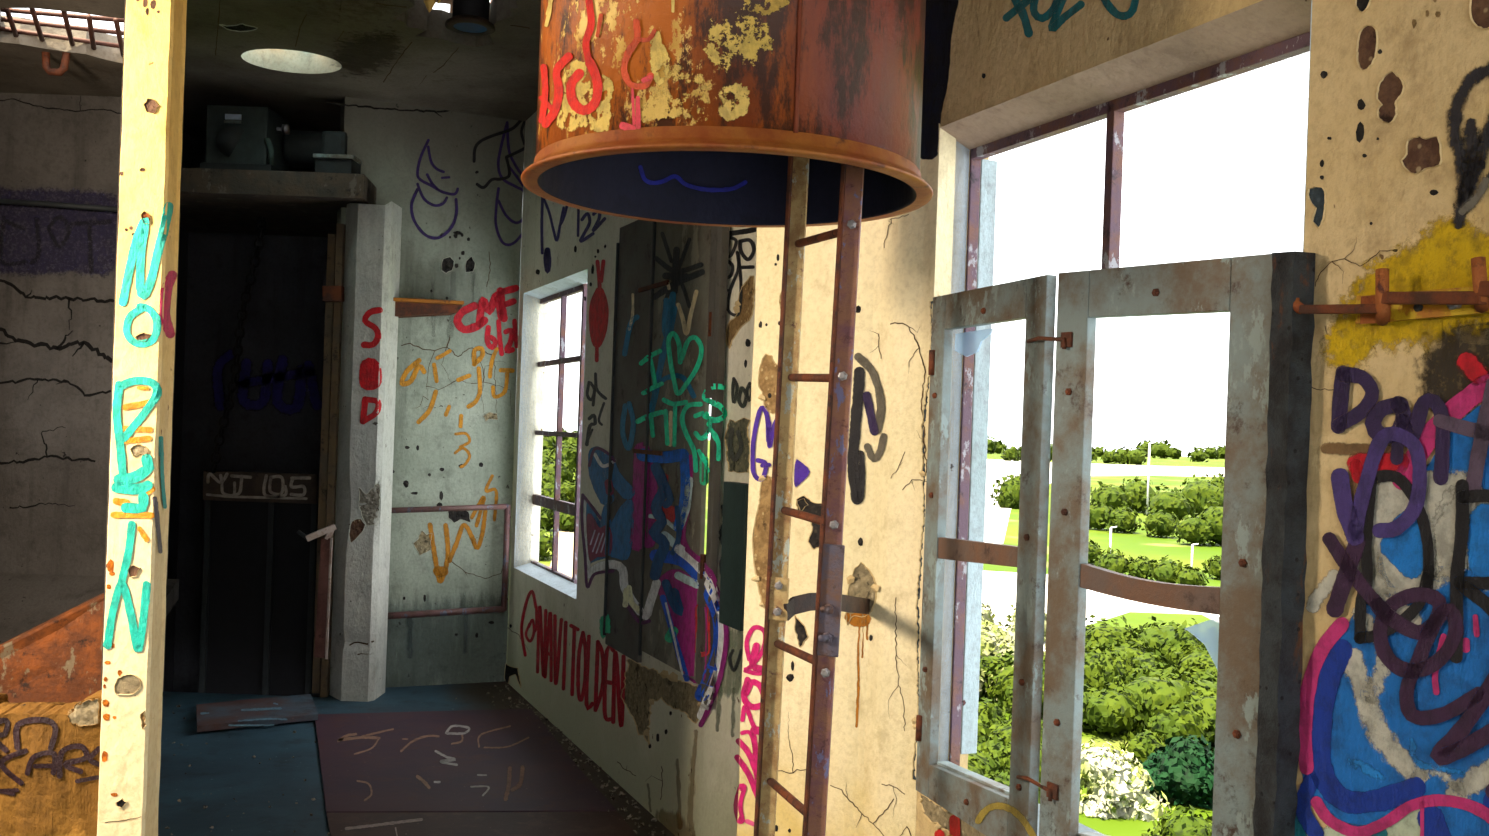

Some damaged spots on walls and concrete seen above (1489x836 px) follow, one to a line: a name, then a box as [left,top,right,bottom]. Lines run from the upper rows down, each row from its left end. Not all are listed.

flaking render [1469,0,1489,30]
flaking render [1355,0,1405,158]
flaking render [1400,135,1443,175]
peeling [977,159,997,289]
crack [0,279,114,398]
crack [0,426,95,465]
peeling [968,324,992,542]
crack [9,502,75,510]
peeling [911,375,986,836]
flaking render [621,659,701,748]
corrosion [844,613,871,728]